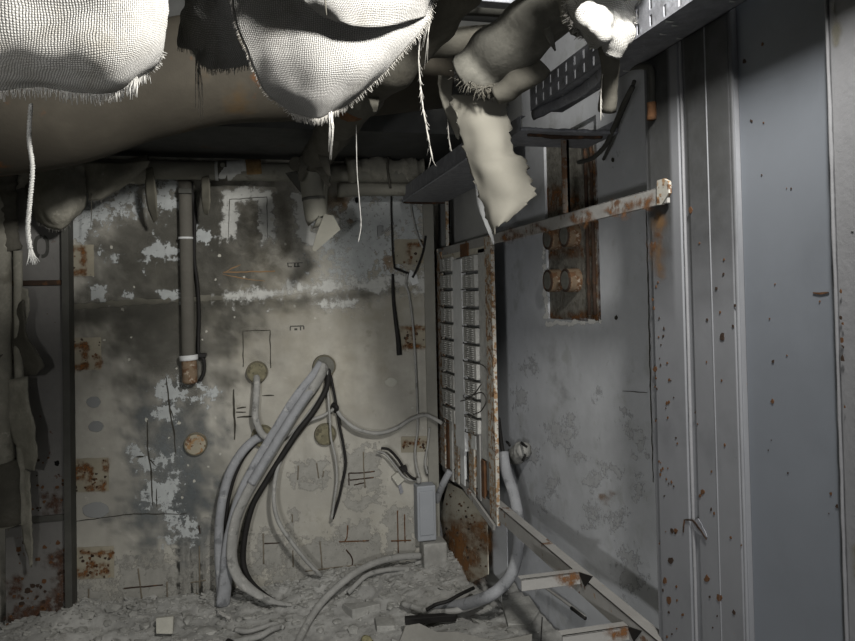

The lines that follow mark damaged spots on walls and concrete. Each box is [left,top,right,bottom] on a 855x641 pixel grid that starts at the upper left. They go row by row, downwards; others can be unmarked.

peeling [73,179,180,276]
peeling [196,224,216,246]
leakage [192,185,425,364]
corrosion [547,151,601,321]
leakage [74,199,221,527]
peeling [145,368,225,424]
spalling [77,443,215,602]
corrosion [440,482,491,582]
corrosion [665,519,707,539]
corrosion [6,540,65,625]